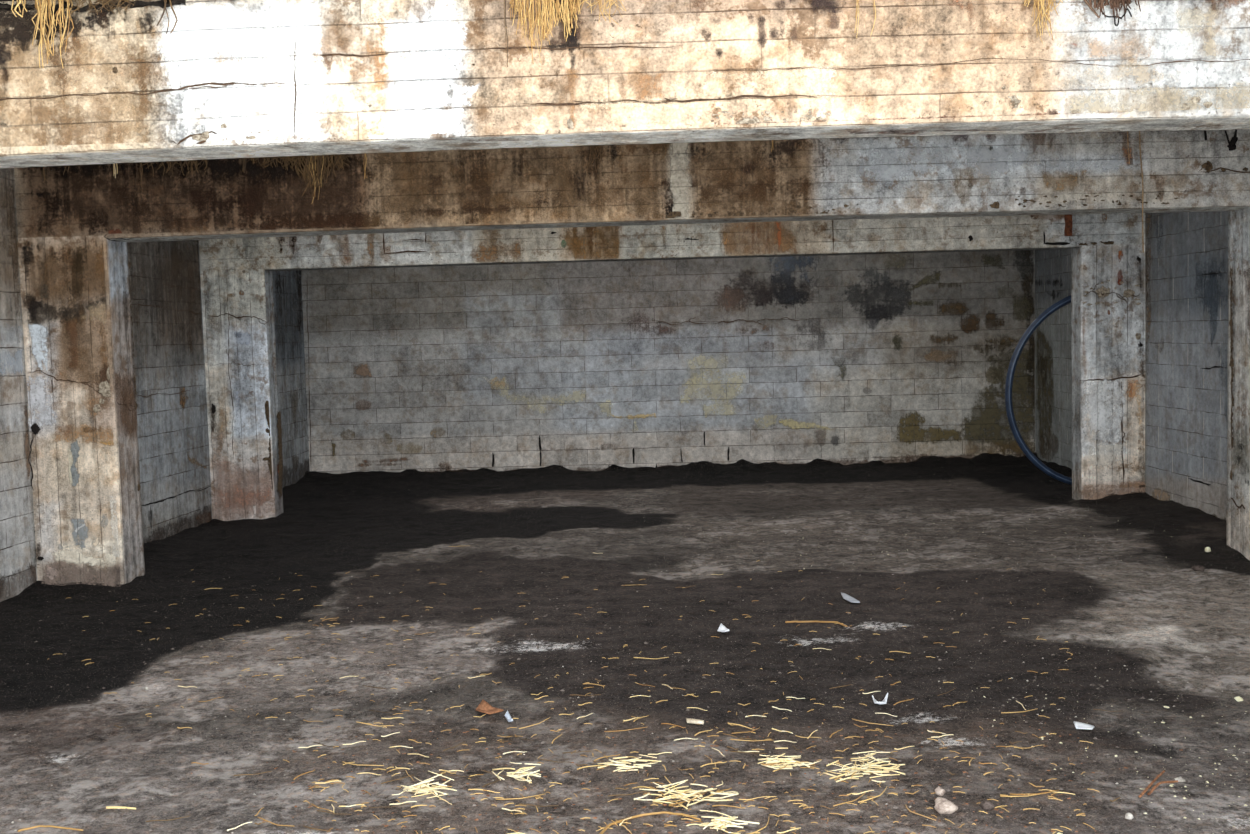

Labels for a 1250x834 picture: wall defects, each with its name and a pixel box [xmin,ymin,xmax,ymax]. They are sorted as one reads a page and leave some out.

water stain [0,50,11,81]
water stain [48,12,109,84]
water stain [24,145,680,259]
water stain [691,139,827,218]
water stain [6,191,106,413]
water stain [476,243,521,262]
water stain [717,256,817,311]
water stain [797,319,825,349]
water stain [824,250,1062,465]
water stain [24,406,34,478]
water stain [55,348,138,489]
water stain [779,419,839,445]